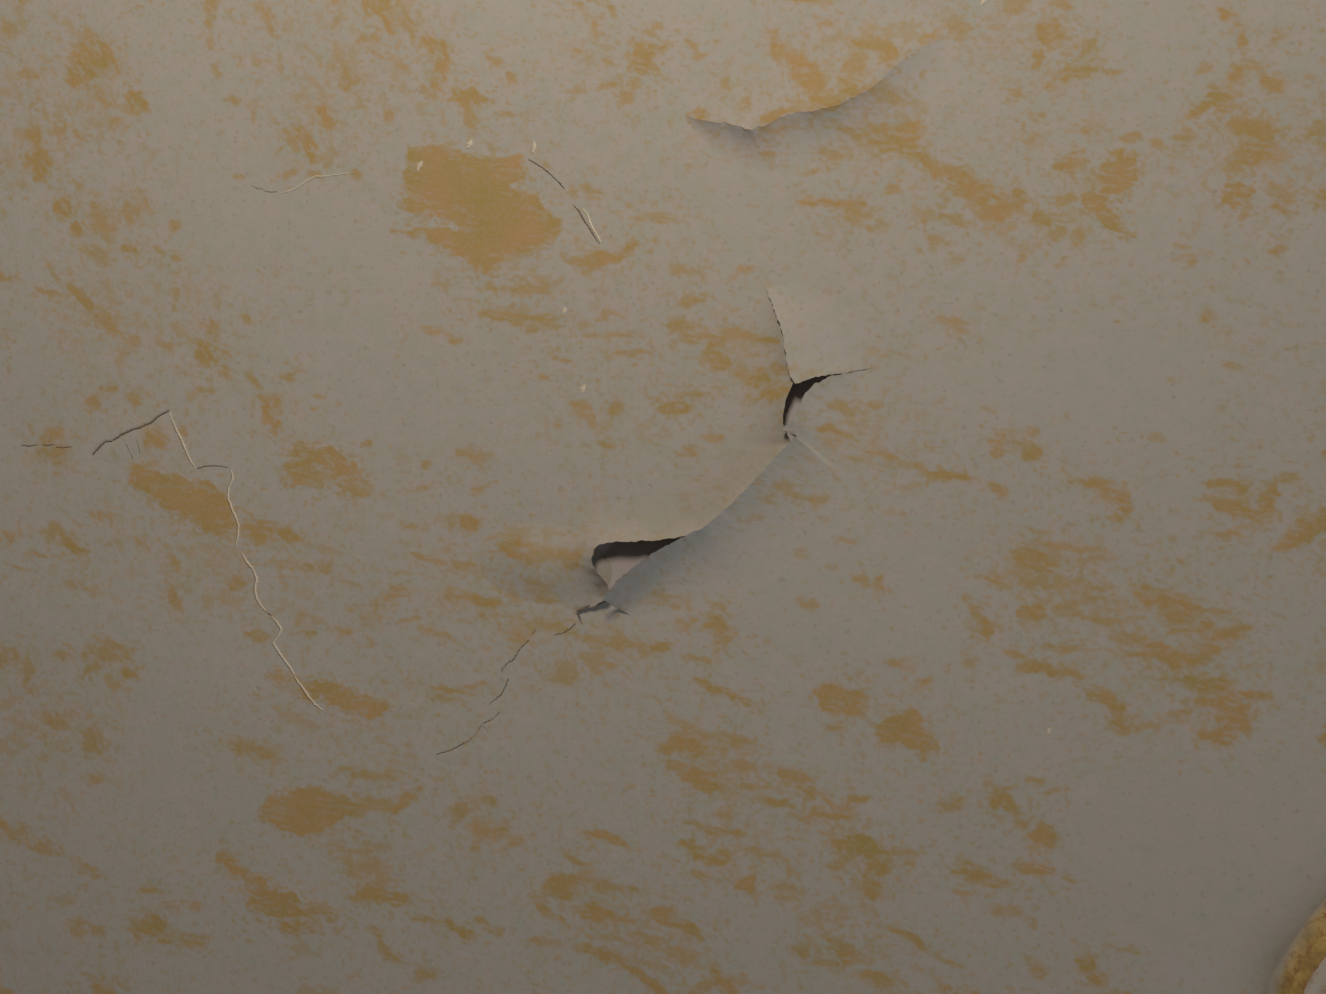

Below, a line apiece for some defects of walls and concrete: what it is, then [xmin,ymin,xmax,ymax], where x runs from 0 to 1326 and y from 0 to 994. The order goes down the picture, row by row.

peeling [685,12,951,172]
crack [23,410,323,711]
peeling [539,282,880,621]